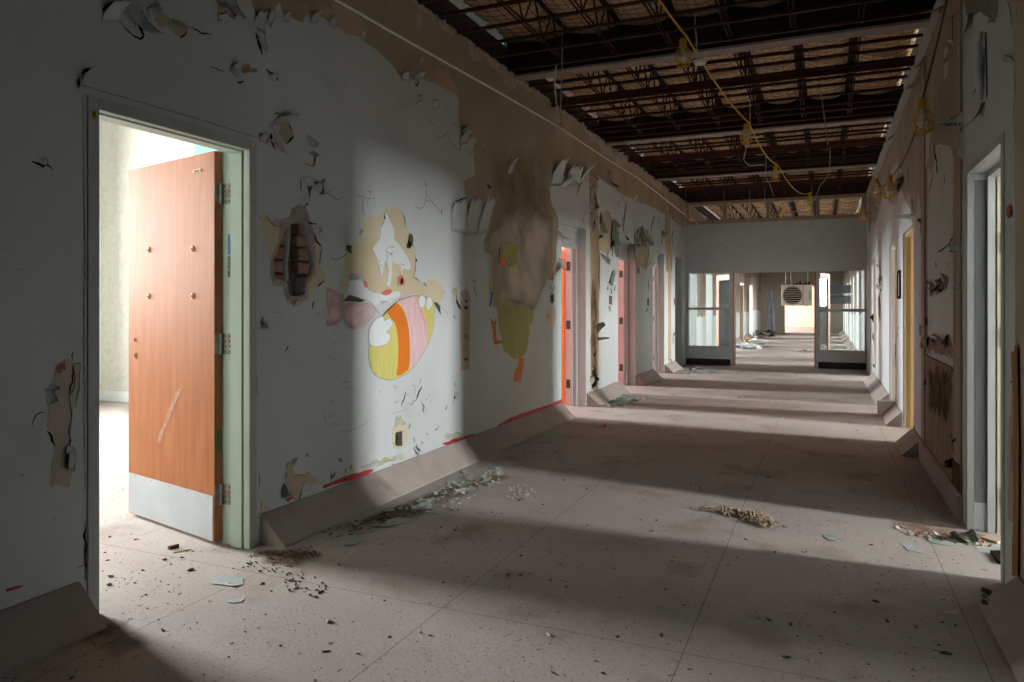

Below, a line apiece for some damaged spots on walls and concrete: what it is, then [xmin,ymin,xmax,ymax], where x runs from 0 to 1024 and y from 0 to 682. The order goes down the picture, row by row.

flaking render [102,0,709,391]
flaking render [689,272,761,318]
flaking render [843,0,1024,580]
peeling [45,352,82,489]
peeling [281,458,355,502]